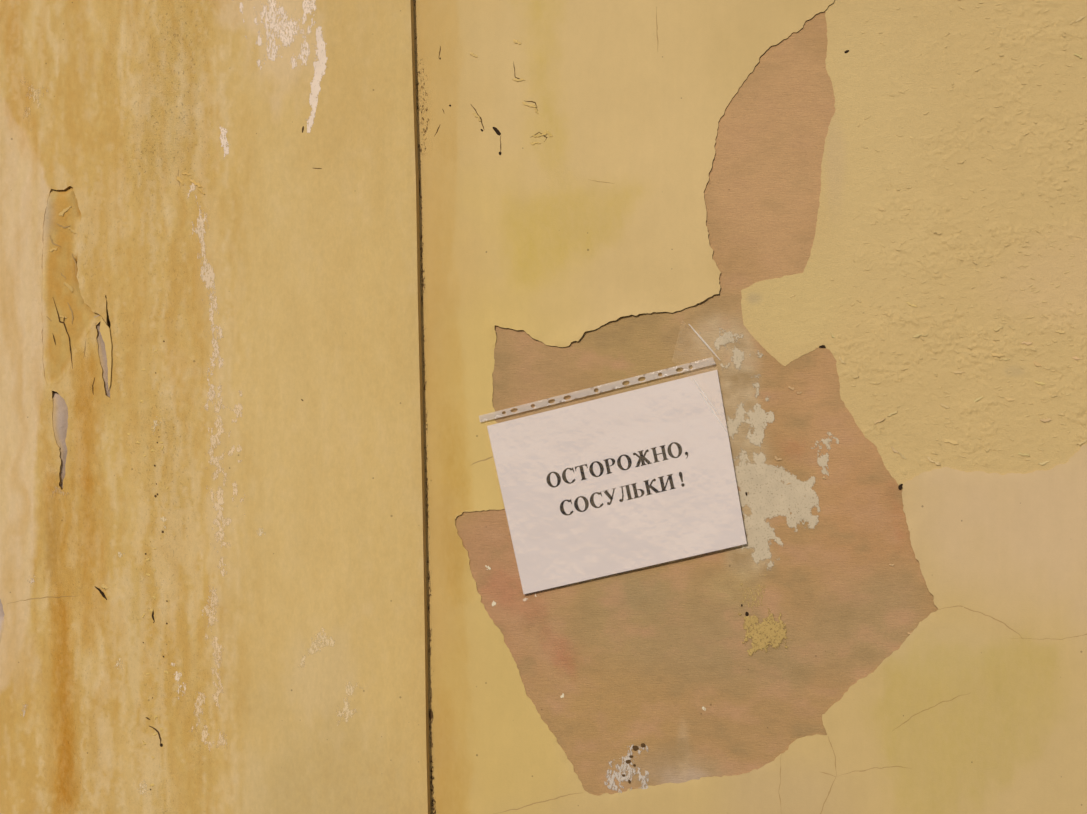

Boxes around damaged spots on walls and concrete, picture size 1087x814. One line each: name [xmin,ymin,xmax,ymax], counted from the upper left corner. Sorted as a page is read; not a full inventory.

water stain [219,127,229,157]
water stain [233,0,328,133]
flaking render [42,187,112,489]
efflorescence [187,179,245,577]
peeling [455,11,938,796]
efflorescence [171,588,228,751]